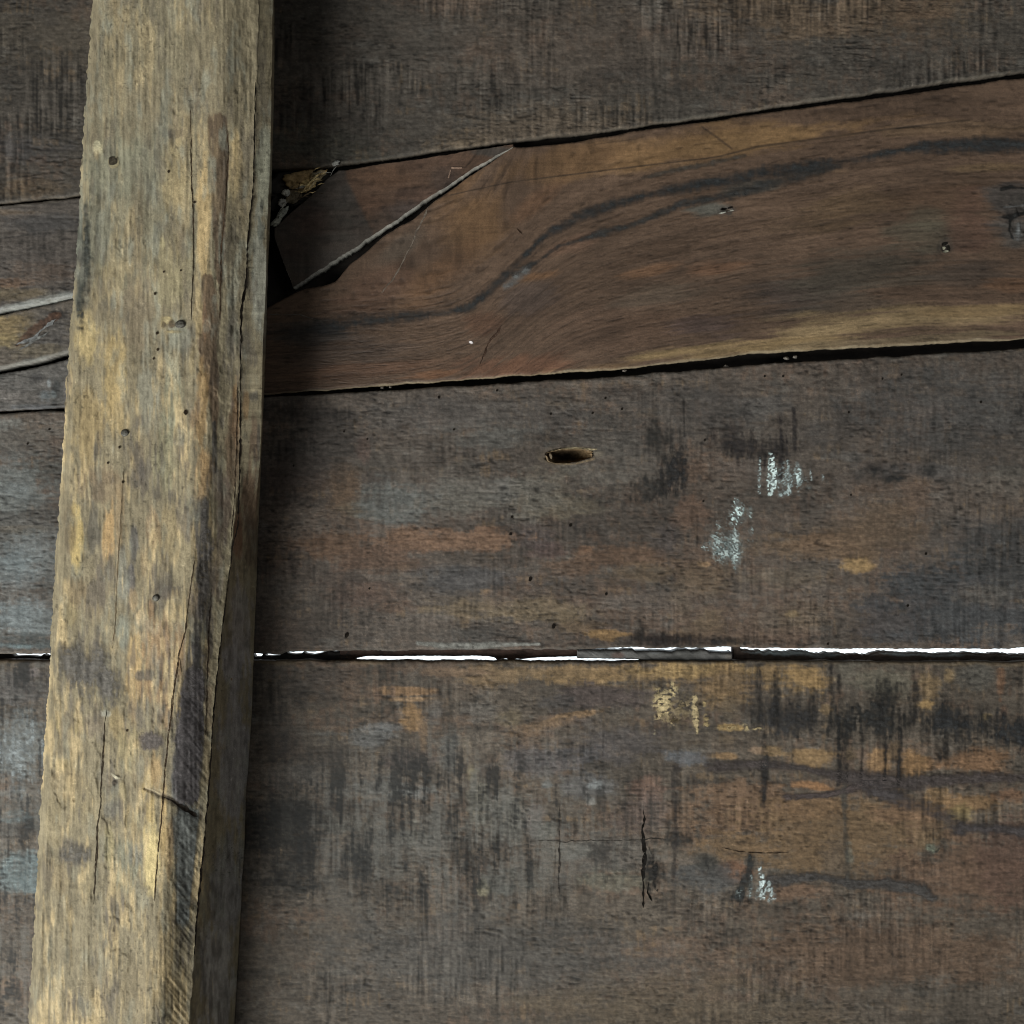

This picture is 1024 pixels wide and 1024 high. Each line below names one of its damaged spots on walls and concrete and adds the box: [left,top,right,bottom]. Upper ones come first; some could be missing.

crack [154,82,256,955]
crack [93,711,107,904]
crack [539,808,665,908]